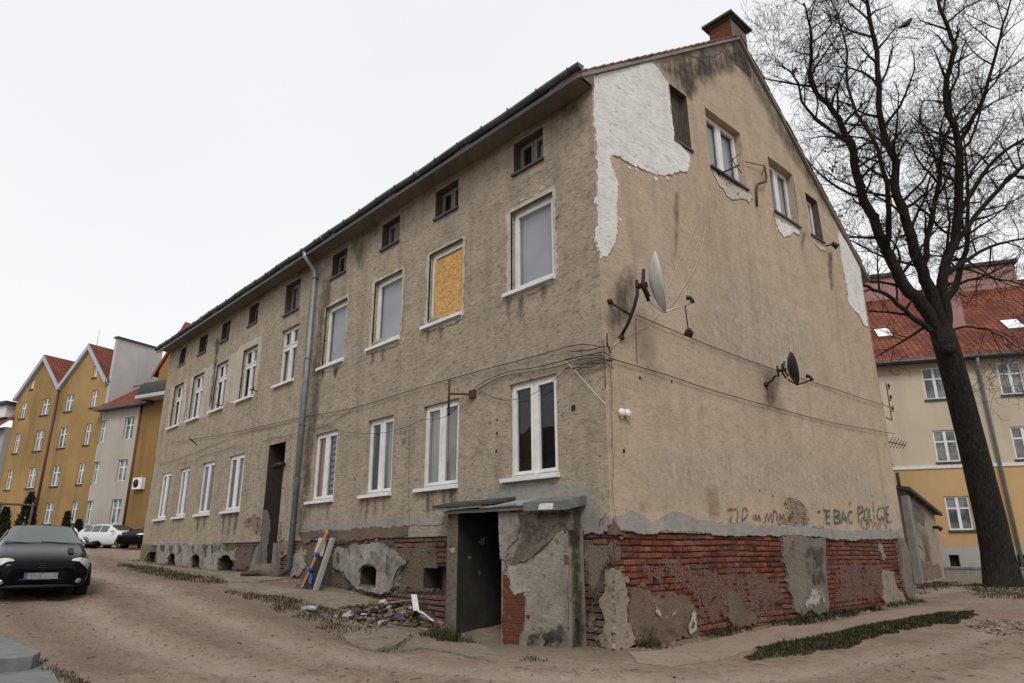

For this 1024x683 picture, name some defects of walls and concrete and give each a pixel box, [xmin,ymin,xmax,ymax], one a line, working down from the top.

flaking render [591,61,691,260]
spalling [712,170,753,205]
flaking render [770,208,868,328]
spalling [772,495,810,527]
peeling [478,511,574,645]
damp [573,618,584,648]